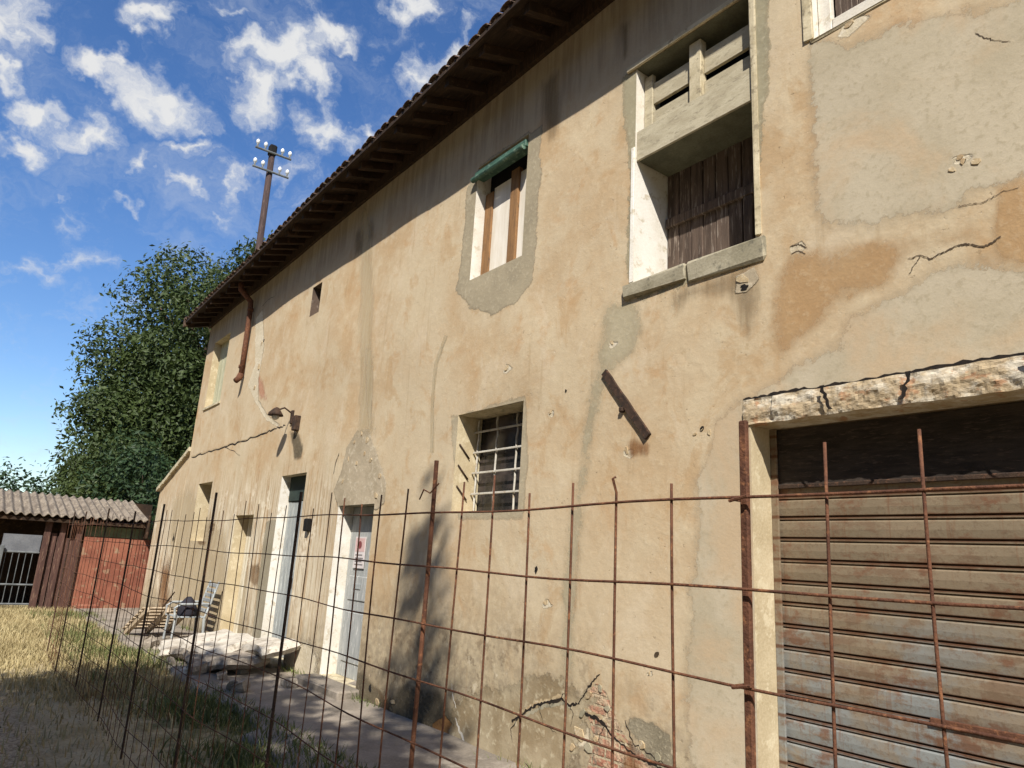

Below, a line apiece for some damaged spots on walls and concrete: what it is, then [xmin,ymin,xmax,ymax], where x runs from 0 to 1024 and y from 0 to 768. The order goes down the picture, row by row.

crack [908,236,1001,274]
crack [191,424,285,458]
crack [430,336,447,452]
peeling [683,0,1024,768]
crack [743,352,1024,409]
peeling [433,302,661,768]
crack [510,674,664,768]